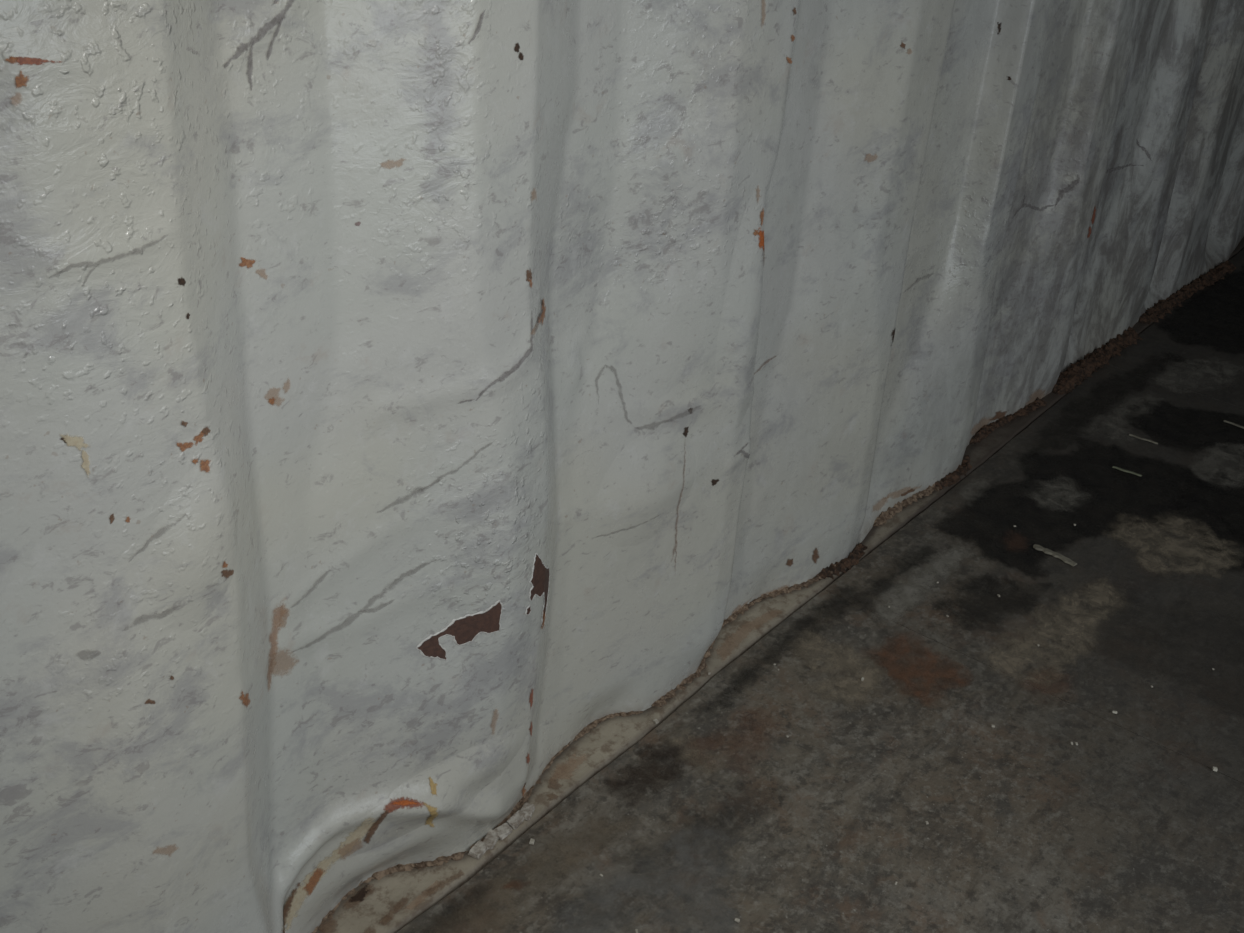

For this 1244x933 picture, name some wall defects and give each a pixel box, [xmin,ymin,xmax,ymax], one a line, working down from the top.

rust [754,208,764,249]
rust [873,260,1236,526]
peeling [416,600,503,661]
peeling [525,553,550,629]
rust [722,543,868,627]
leakage [938,576,1038,628]
rust [495,640,715,828]
rust [283,778,438,933]
rust [312,837,485,933]